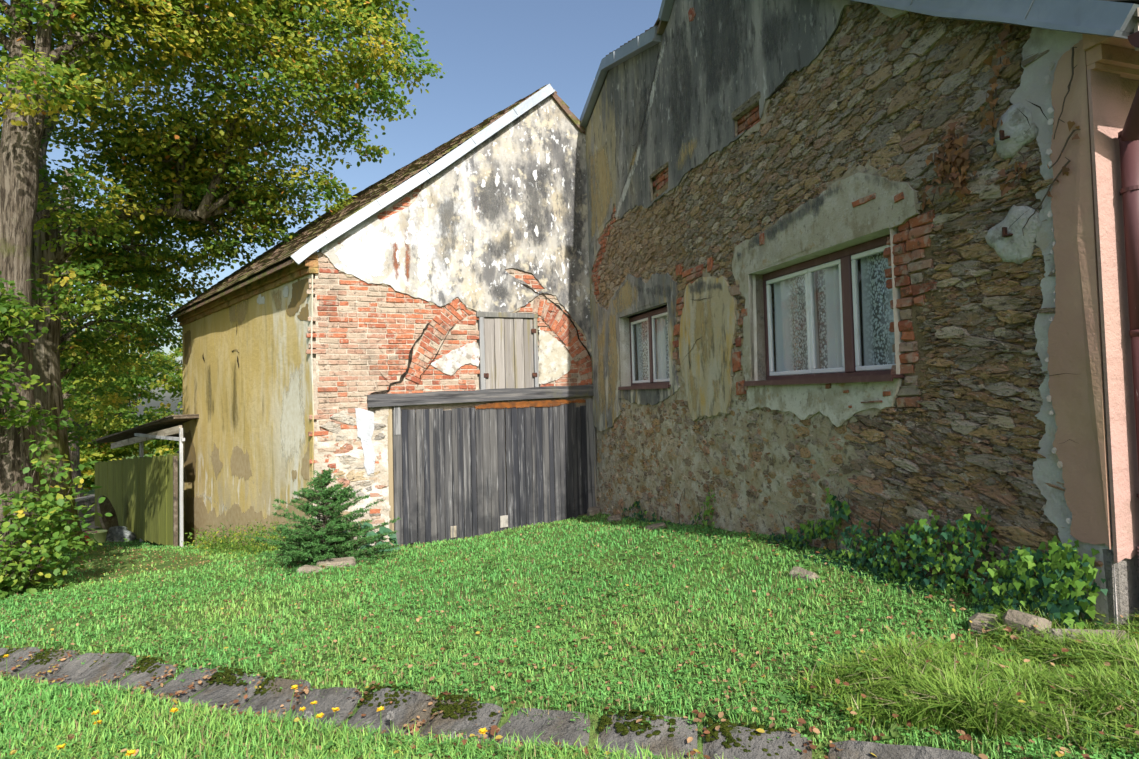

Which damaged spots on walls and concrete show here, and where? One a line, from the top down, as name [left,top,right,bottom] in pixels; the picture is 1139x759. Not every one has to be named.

water stain [703,0,742,94]
water stain [439,200,457,258]
water stain [481,176,507,220]
water stain [487,232,510,256]
peeling [467,153,550,187]
peeling [514,204,553,239]
water stain [526,21,697,257]
flaking render [184,183,480,551]
crack [369,321,456,395]
flaking render [503,259,592,387]
flaking render [591,2,1139,632]